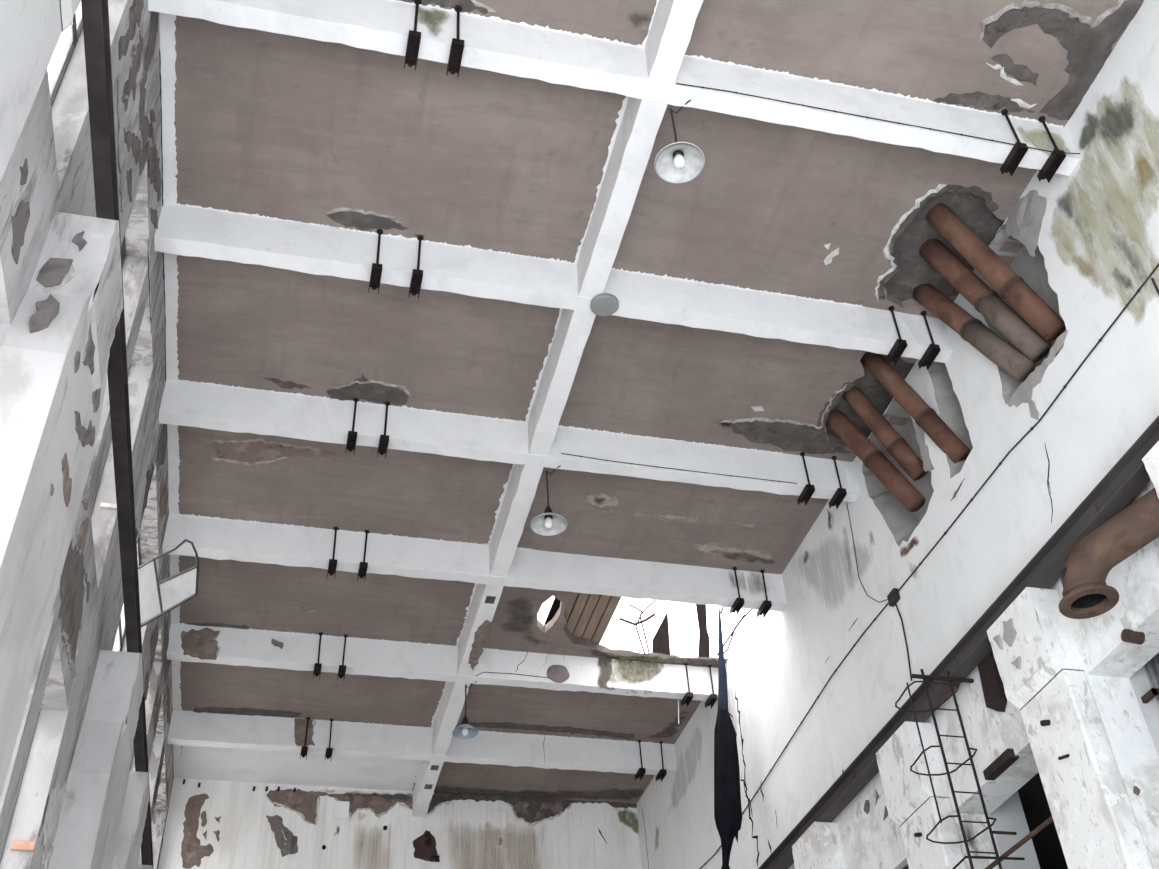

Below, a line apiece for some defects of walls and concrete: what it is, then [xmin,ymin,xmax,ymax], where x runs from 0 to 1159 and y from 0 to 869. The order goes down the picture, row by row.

flaking render [934,0,1143,120]
peeling [118,0,162,229]
mould [1024,80,1159,318]
peeling [29,231,87,333]
flaking render [1007,330,1069,420]
peeling [50,453,90,677]
peeling [145,615,249,805]
damp [598,655,664,694]
peeling [181,794,221,869]
flaking render [265,789,412,857]
spalling [413,830,440,862]
flaking render [428,792,637,826]